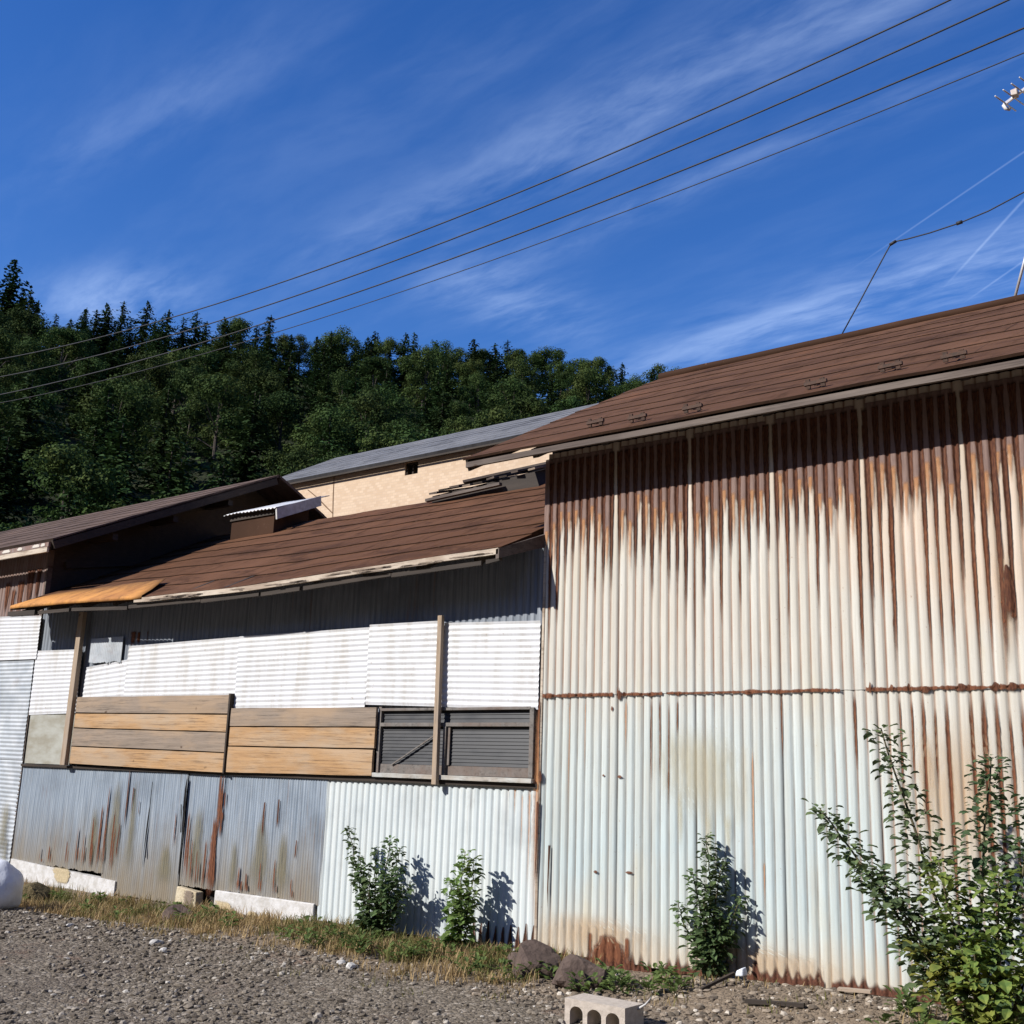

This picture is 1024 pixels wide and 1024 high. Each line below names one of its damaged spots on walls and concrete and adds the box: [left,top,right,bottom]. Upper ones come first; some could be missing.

corrosion [544,376,1024,651]
corrosion [65,771,140,866]
corrosion [173,775,226,886]
corrosion [507,687,840,903]
corrosion [866,682,1024,900]
corrosion [556,933,707,976]
corrosion [747,960,974,1007]